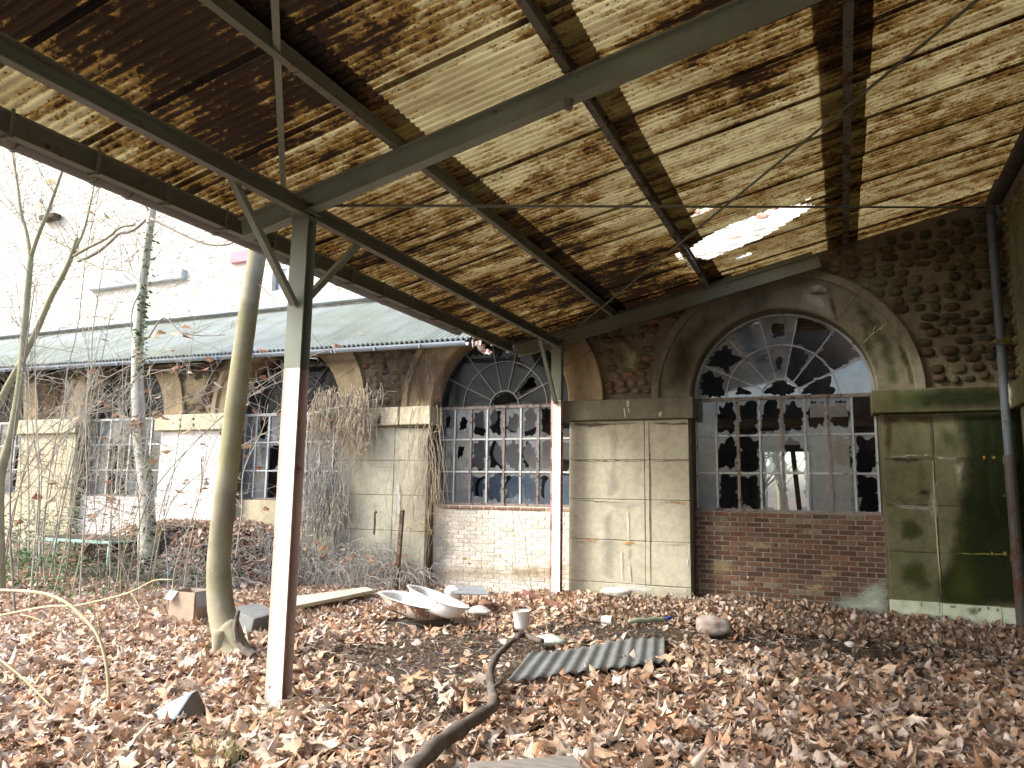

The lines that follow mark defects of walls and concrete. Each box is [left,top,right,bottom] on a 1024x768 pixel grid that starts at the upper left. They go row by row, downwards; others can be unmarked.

damp [941,414,1024,604]